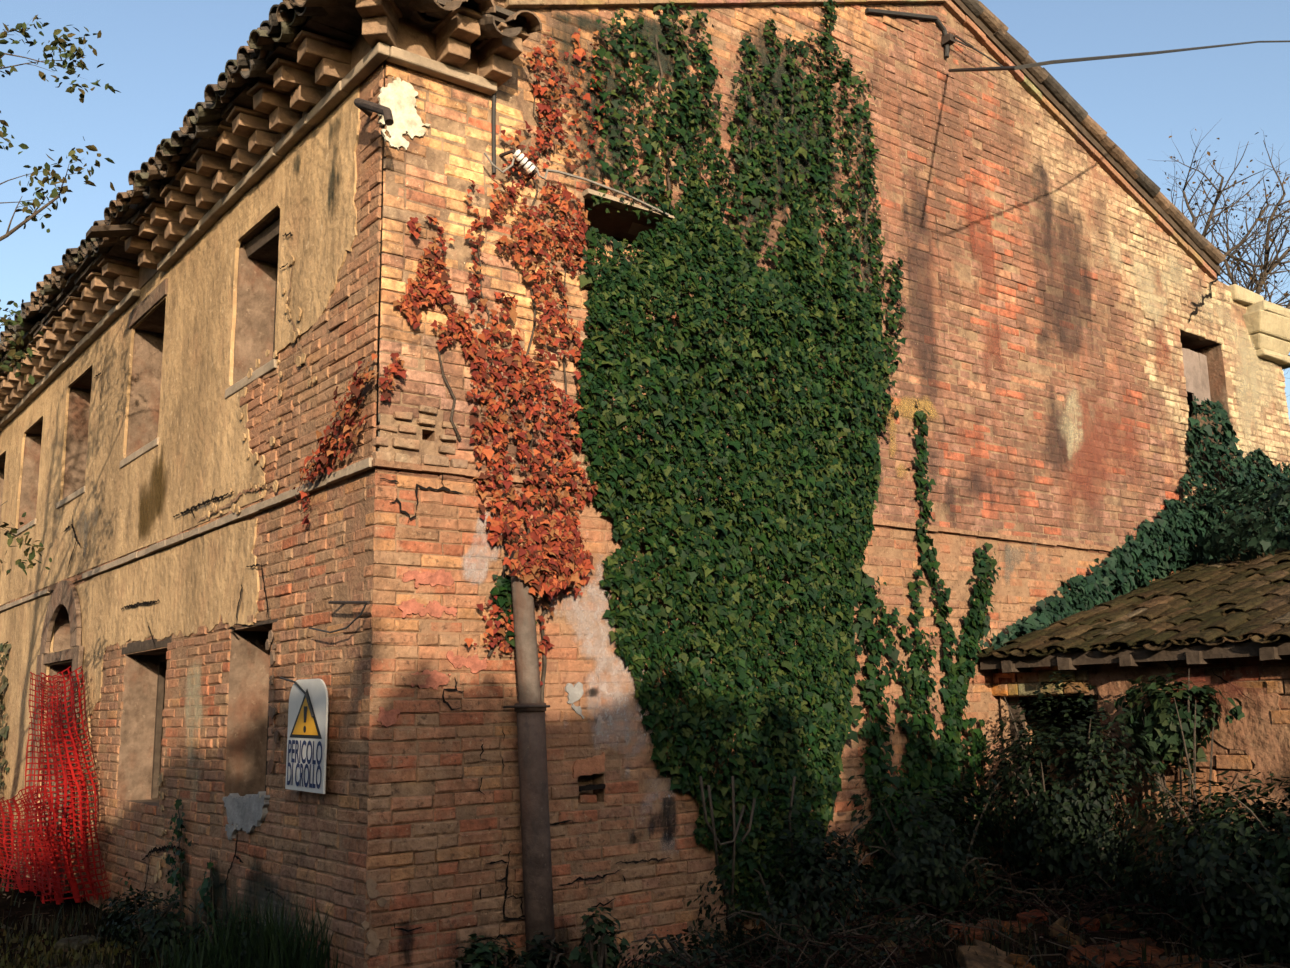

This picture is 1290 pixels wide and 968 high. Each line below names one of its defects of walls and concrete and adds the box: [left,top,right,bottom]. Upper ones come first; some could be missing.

peeling [377,76,430,151]
water stain [1033,167,1081,341]
crack [1188,279,1218,322]
crack [173,489,234,518]
crack [380,474,463,522]
spalling [572,752,606,803]